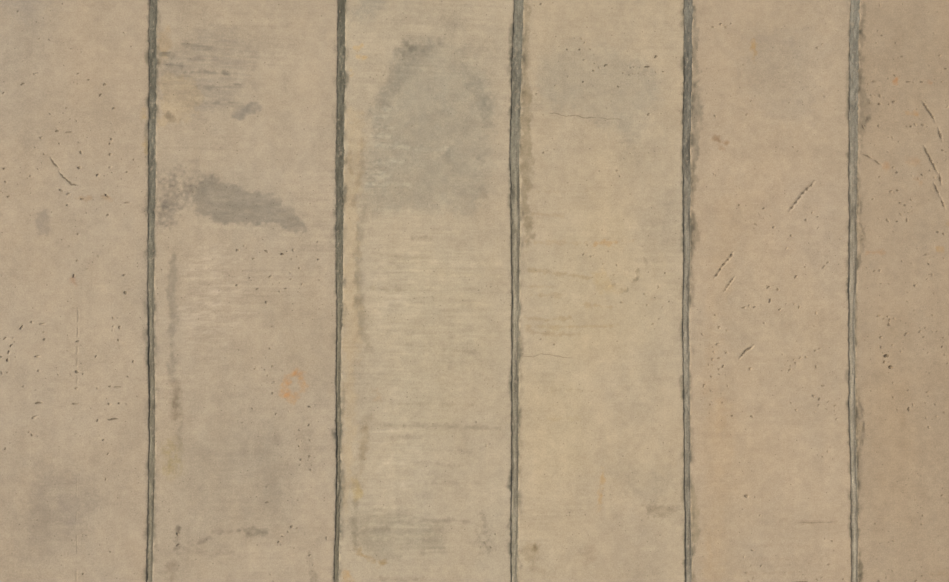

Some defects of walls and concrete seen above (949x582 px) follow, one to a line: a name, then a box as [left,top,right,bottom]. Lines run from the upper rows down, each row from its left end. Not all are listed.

water stain [154,0,683,582]
water stain [719,4,845,141]